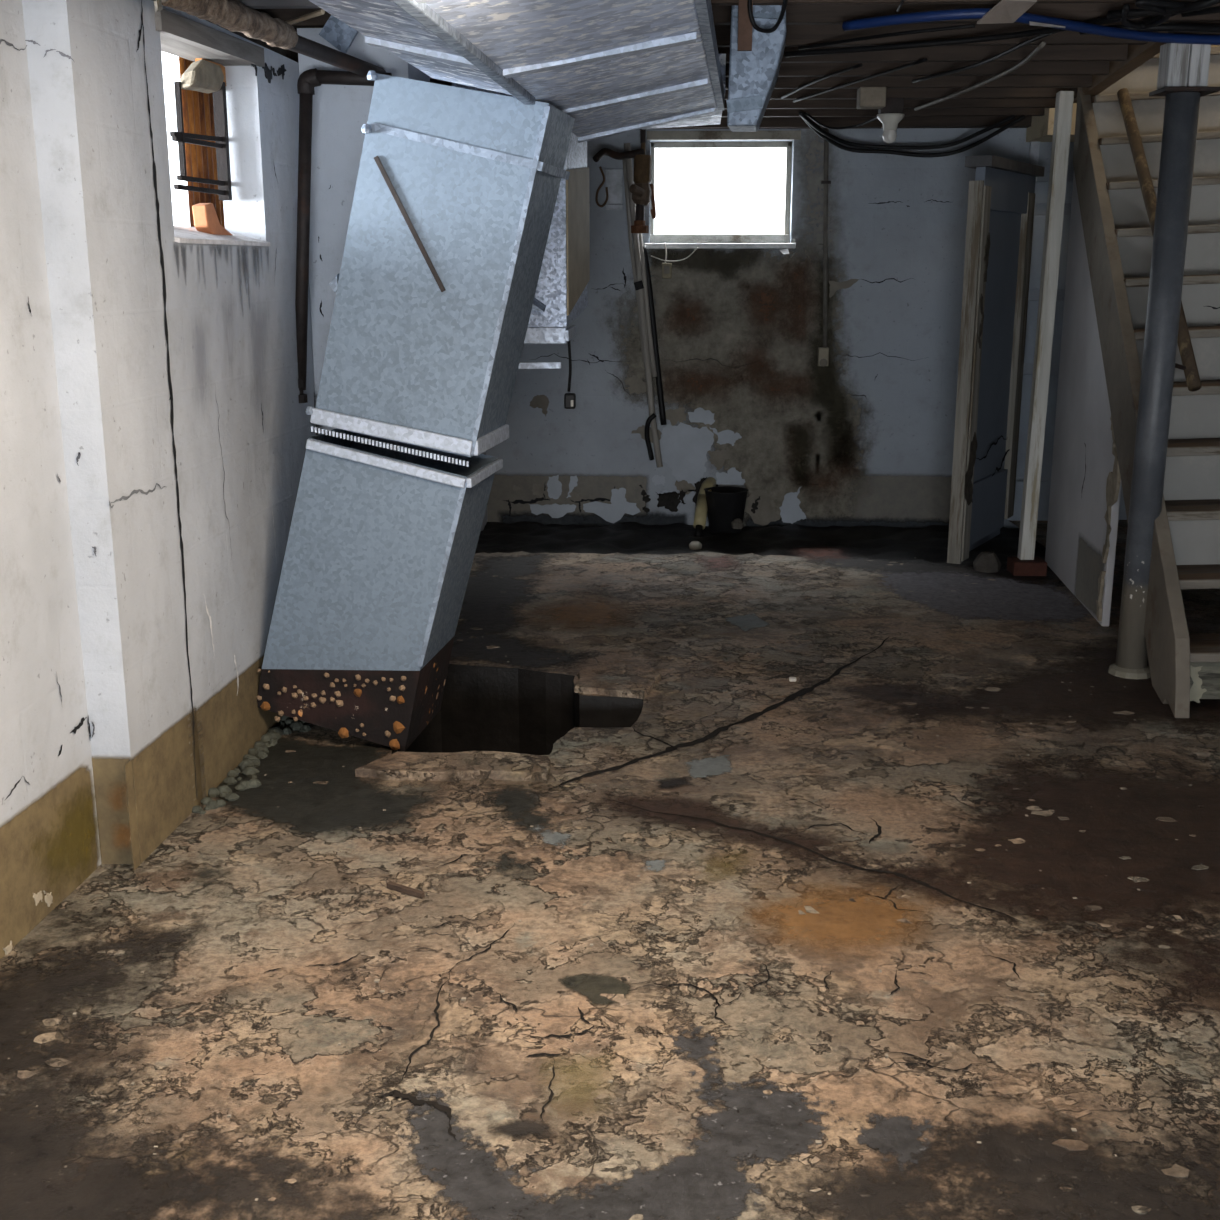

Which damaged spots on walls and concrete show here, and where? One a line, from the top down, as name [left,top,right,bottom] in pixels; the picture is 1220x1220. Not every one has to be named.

crack [109,0,214,797]
damp [487,474,687,528]
peeling [529,407,806,526]
damp [619,132,952,529]
peeling [879,417,1121,624]
rust [256,669,406,722]
rust [338,723,366,739]
rust [385,721,405,750]
crack [550,637,1024,923]
damp [604,756,1220,1010]
peeling [1190,665,1207,703]
crack [375,921,515,1139]